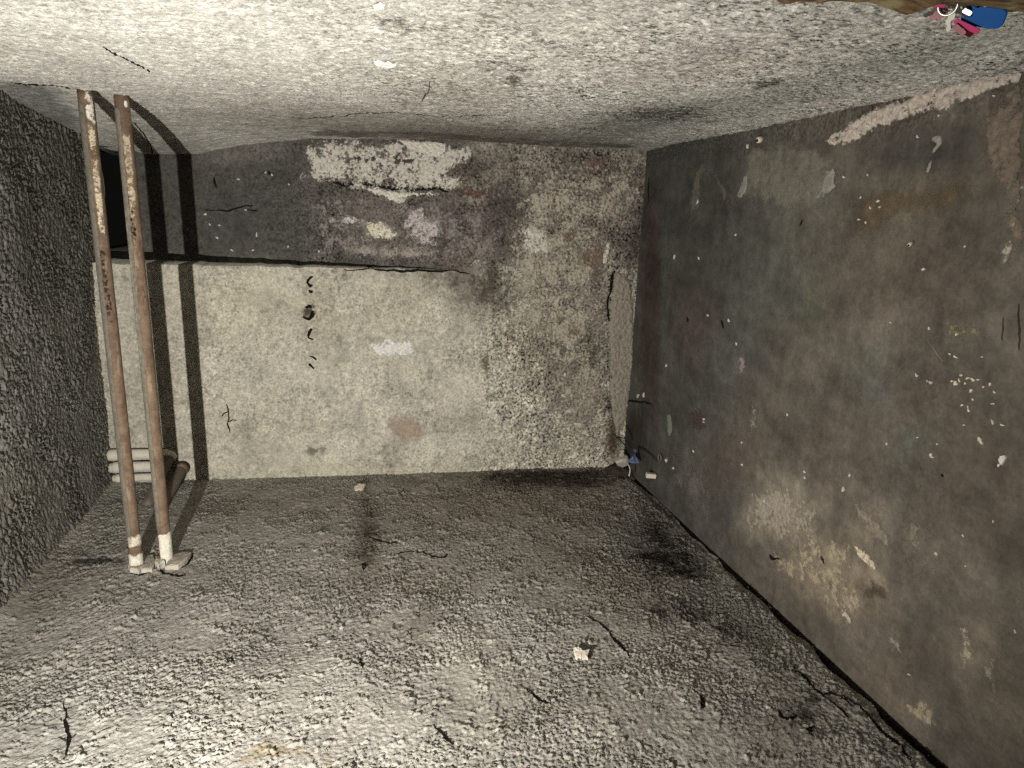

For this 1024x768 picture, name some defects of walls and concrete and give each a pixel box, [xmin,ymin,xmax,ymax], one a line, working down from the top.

spalling [827,73,1024,241]
damp [520,227,552,256]
crack [346,266,469,274]
spalling [312,150,647,439]
crack [606,271,615,321]
crack [587,616,630,657]
crack [633,480,945,768]
crack [58,702,76,756]